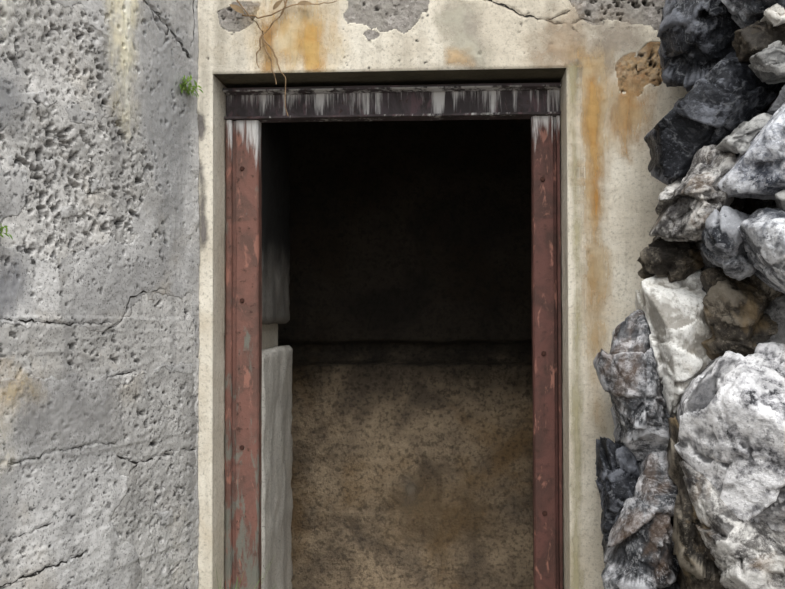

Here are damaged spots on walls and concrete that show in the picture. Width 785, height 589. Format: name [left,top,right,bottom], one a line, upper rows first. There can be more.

crack [143,0,195,58]
spalling [217,2,261,33]
corrosion [261,6,321,71]
spalling [343,0,429,41]
crack [488,0,596,33]
spalling [569,0,665,30]
spalling [615,42,663,96]
corrosion [576,51,647,305]
crack [3,288,164,334]
crack [2,442,195,473]
crack [0,552,86,589]